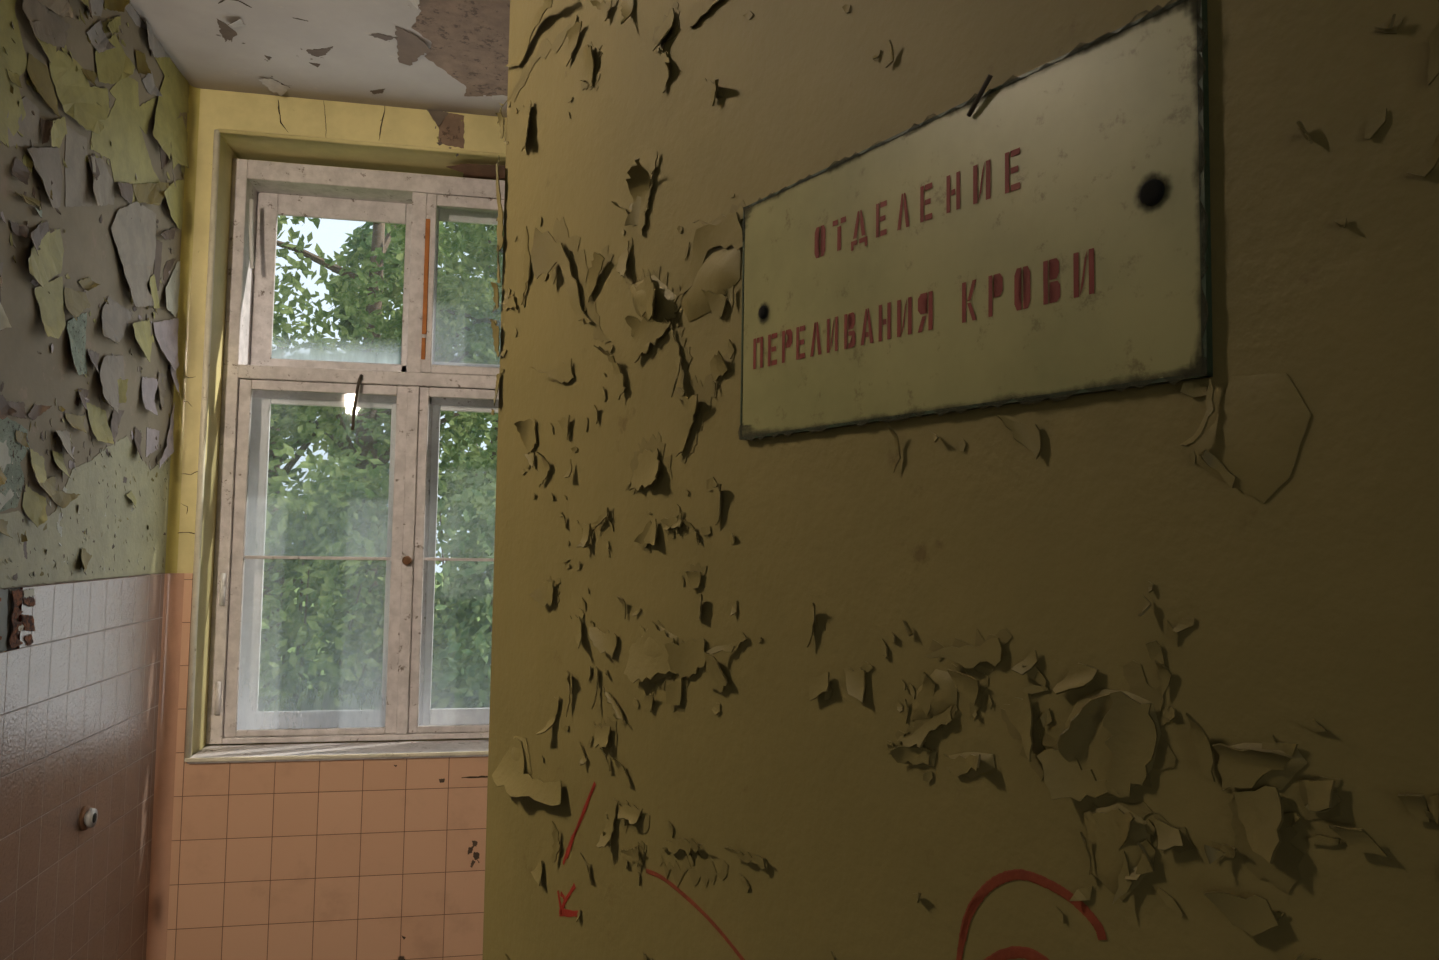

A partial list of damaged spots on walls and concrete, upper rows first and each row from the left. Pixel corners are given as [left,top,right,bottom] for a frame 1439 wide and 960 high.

peeling [217,19,245,44]
peeling [297,46,333,67]
peeling [0,0,189,652]